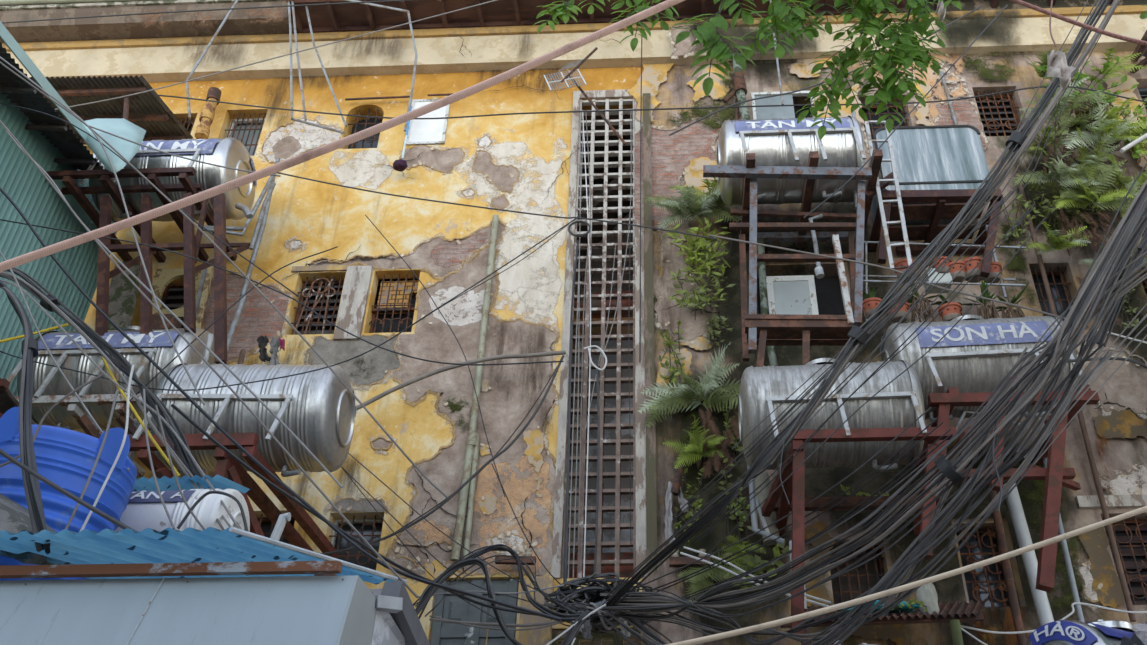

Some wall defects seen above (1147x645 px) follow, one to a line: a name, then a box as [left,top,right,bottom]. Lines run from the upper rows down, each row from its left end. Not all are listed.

peeling [259,115,343,164]
peeling [285,133,565,581]